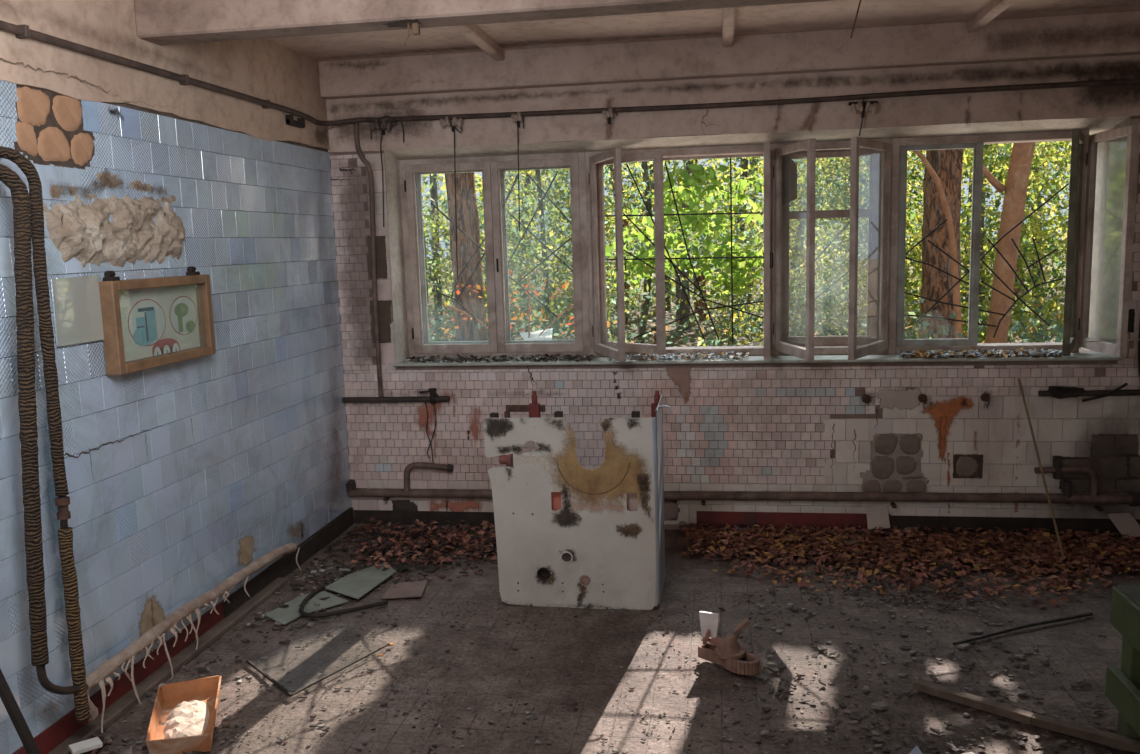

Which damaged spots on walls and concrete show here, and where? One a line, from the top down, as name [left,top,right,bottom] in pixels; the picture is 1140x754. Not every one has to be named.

spalling [14,84,187,268]
spalling [861,433,928,492]
rust [923,397,972,483]
spalling [1114,434,1140,493]
peeling [237,535,256,566]
peeling [140,597,165,636]